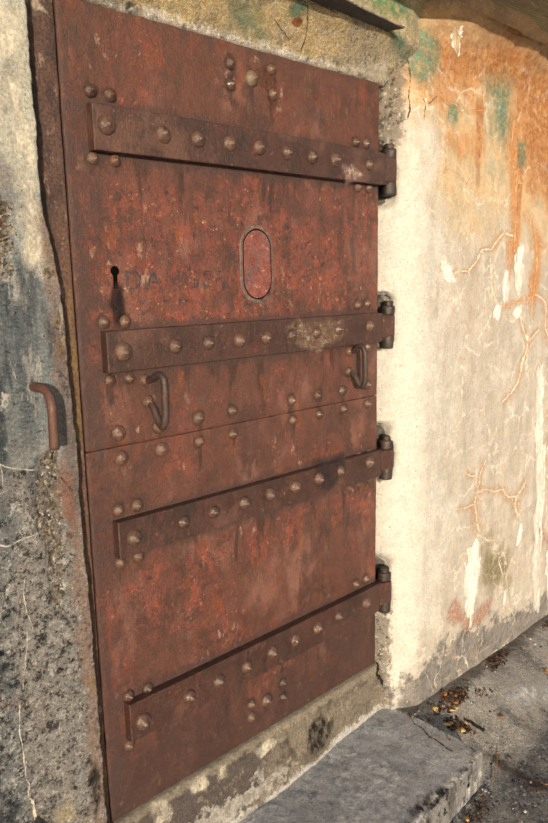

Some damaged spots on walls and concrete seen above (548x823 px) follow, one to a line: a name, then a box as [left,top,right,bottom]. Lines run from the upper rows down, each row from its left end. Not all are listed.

damp [393,29,439,79]
damp [450,26,463,57]
spalling [0,195,15,283]
crack [437,119,548,404]
crack [456,460,526,535]
damp [464,538,481,629]
crack [19,579,37,820]